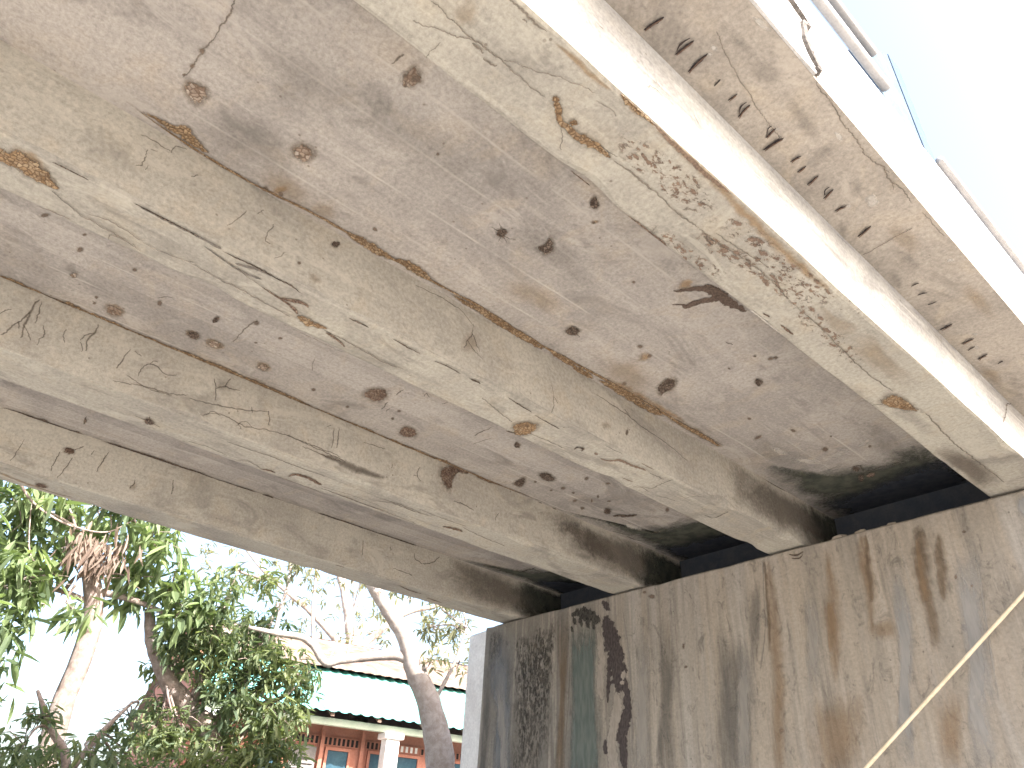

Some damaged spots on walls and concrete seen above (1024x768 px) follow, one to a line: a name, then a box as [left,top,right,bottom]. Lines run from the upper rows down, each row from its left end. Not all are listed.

spalling [619,94,730,211]
crack [816,82,944,255]
spalling [136,204,299,292]
spalling [629,216,857,363]
crack [601,146,892,406]
crack [115,351,504,546]
spalling [439,459,500,489]
water stain [463,564,589,615]
water stain [566,519,748,585]
water stain [749,449,987,541]
corrosion [916,532,946,637]
water stain [570,630,598,768]